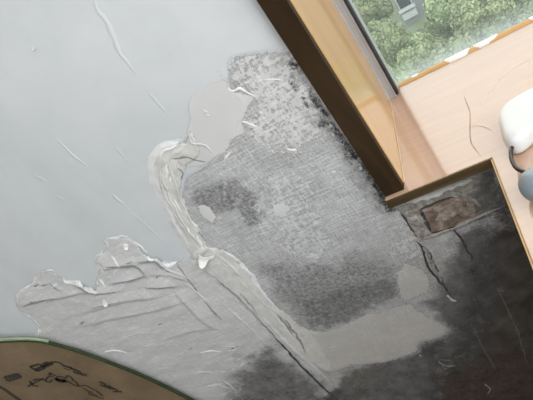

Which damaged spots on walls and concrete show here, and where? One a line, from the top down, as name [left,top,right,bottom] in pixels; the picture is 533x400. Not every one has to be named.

flaking render [15,235,380,400]
crack [214,276,338,400]
flaking render [147,52,511,371]
leakage [331,124,395,212]
leakage [233,206,533,400]
crack [400,213,456,302]
crack [454,230,473,261]